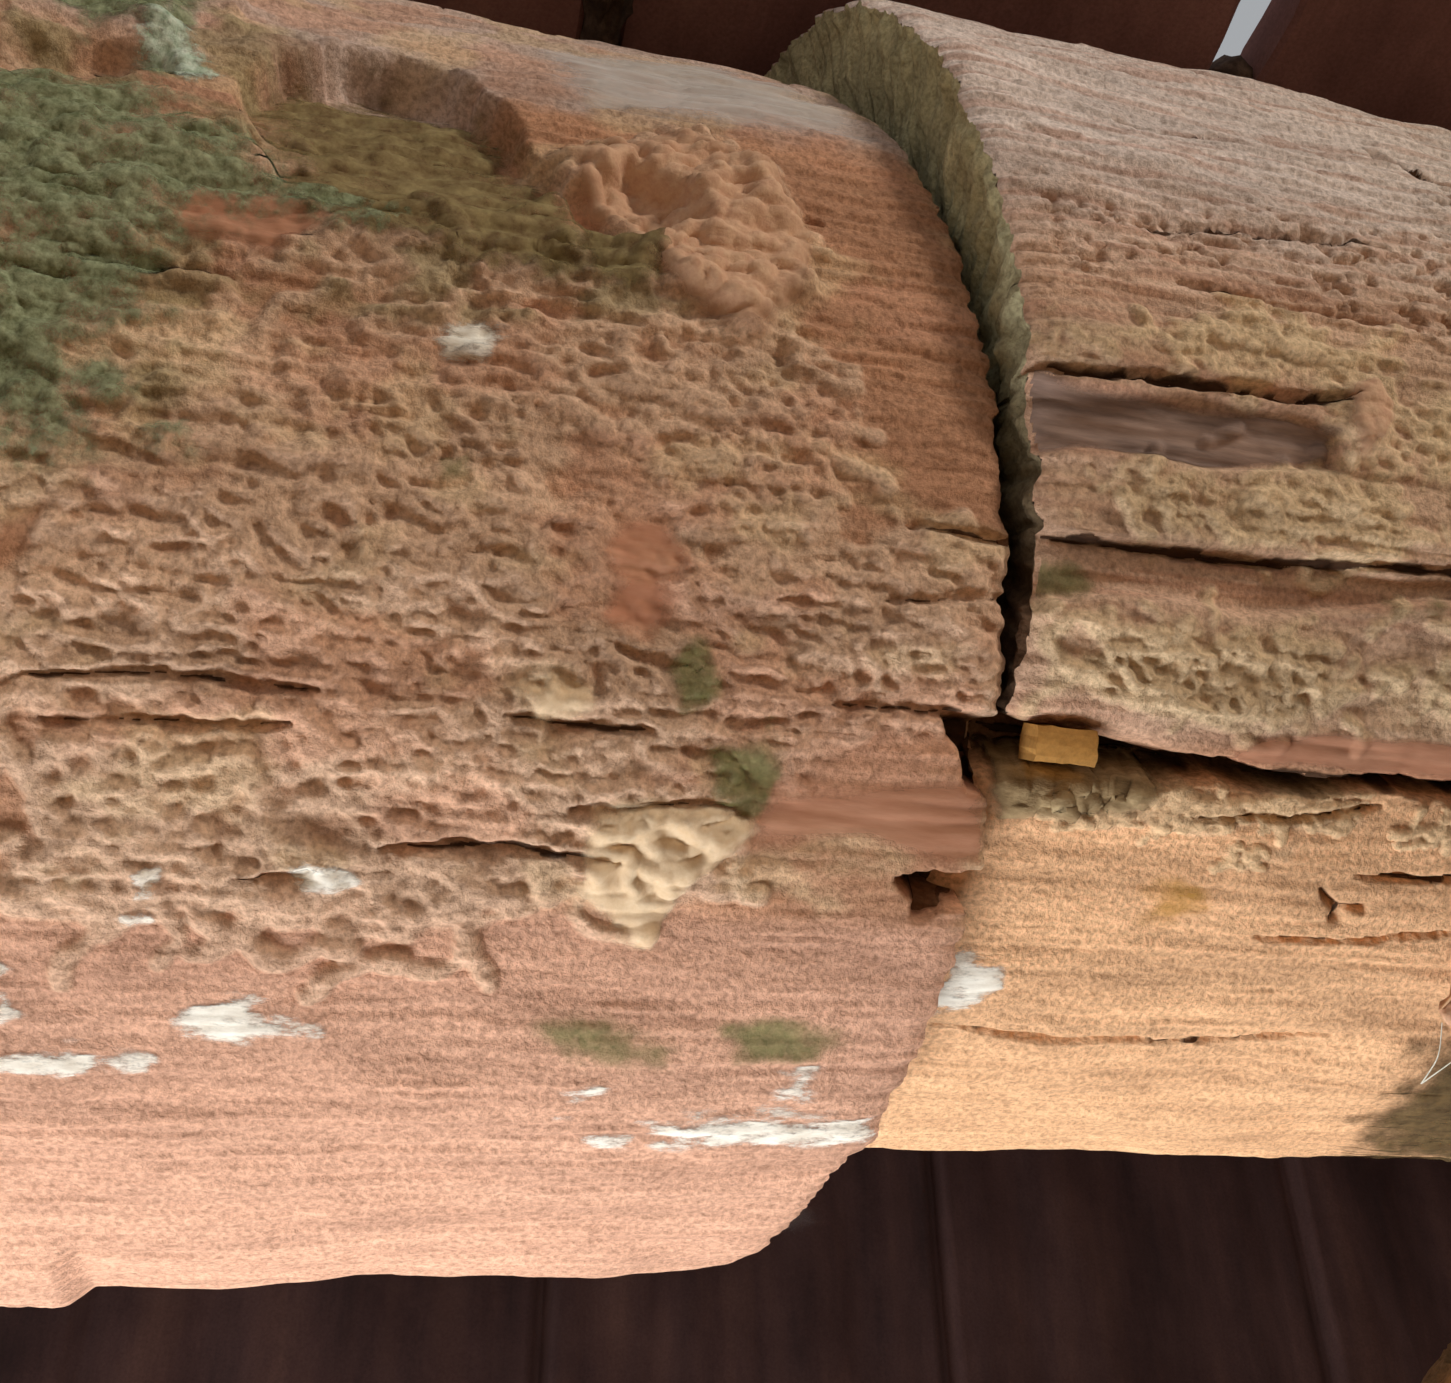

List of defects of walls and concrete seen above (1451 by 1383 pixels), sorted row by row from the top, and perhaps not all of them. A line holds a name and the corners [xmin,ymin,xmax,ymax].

peeling [1030,371,1333,467]
crack [926,528,998,543]
crack [1040,534,1451,577]
crack [905,596,940,604]
crack [29,671,226,682]
crack [260,684,307,724]
crack [64,715,180,723]
crack [407,841,595,858]